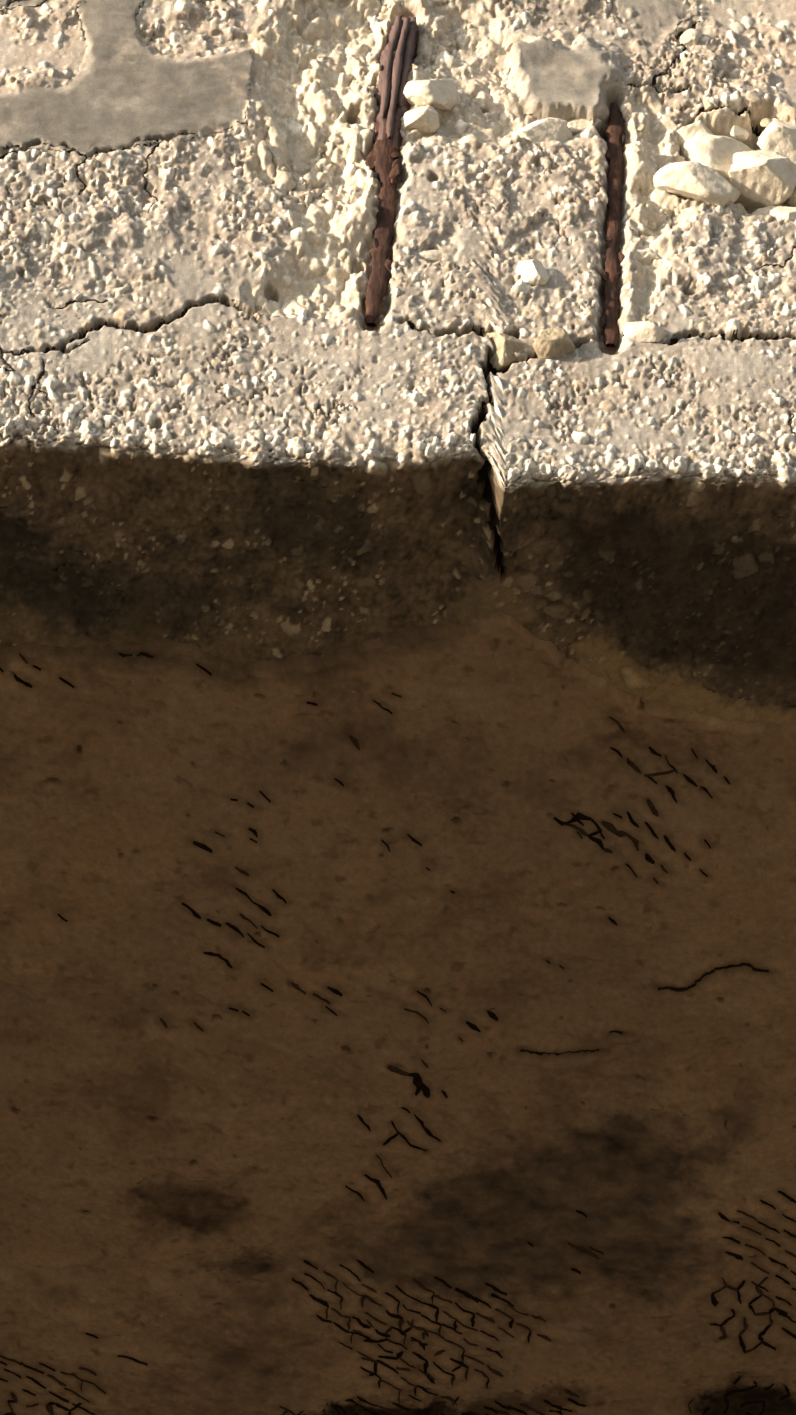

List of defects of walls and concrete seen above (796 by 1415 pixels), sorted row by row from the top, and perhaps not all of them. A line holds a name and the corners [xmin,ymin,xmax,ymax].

crack [0,299,242,417]
corrosion [360,16,419,327]
crack [407,321,538,577]
spalling [239,0,796,331]
corrosion [600,103,626,348]
crack [660,329,796,345]
crack [757,246,796,269]
leakage [115,1078,778,1415]
leakage [684,1372,796,1415]